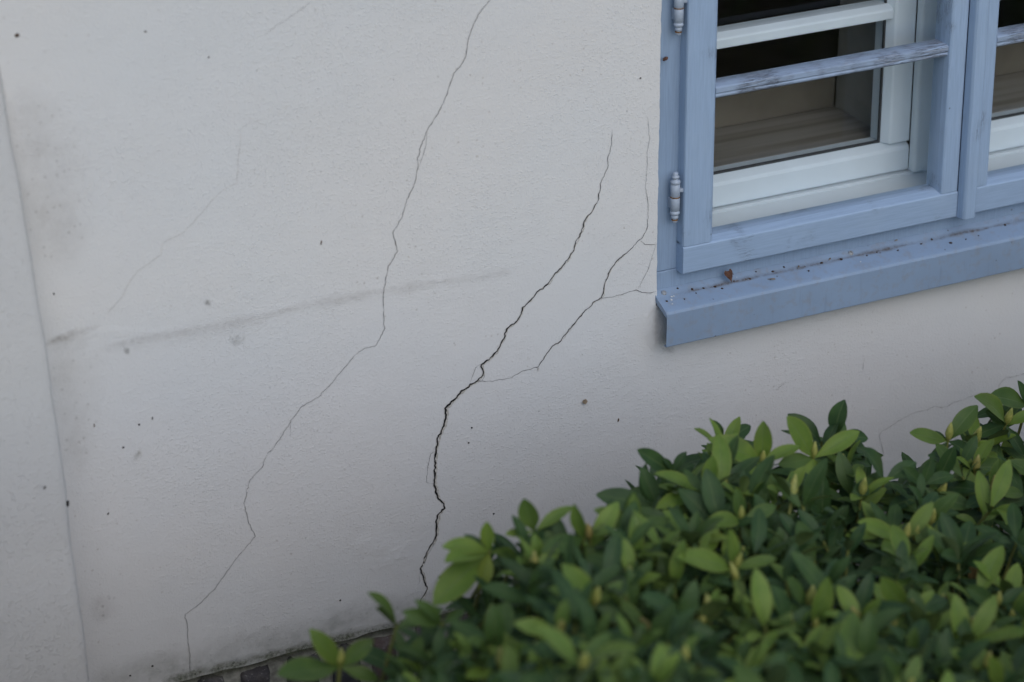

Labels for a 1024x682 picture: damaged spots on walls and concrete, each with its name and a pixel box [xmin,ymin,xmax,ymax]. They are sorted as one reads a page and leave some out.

crack [185,0,490,668]
crack [419,124,656,608]